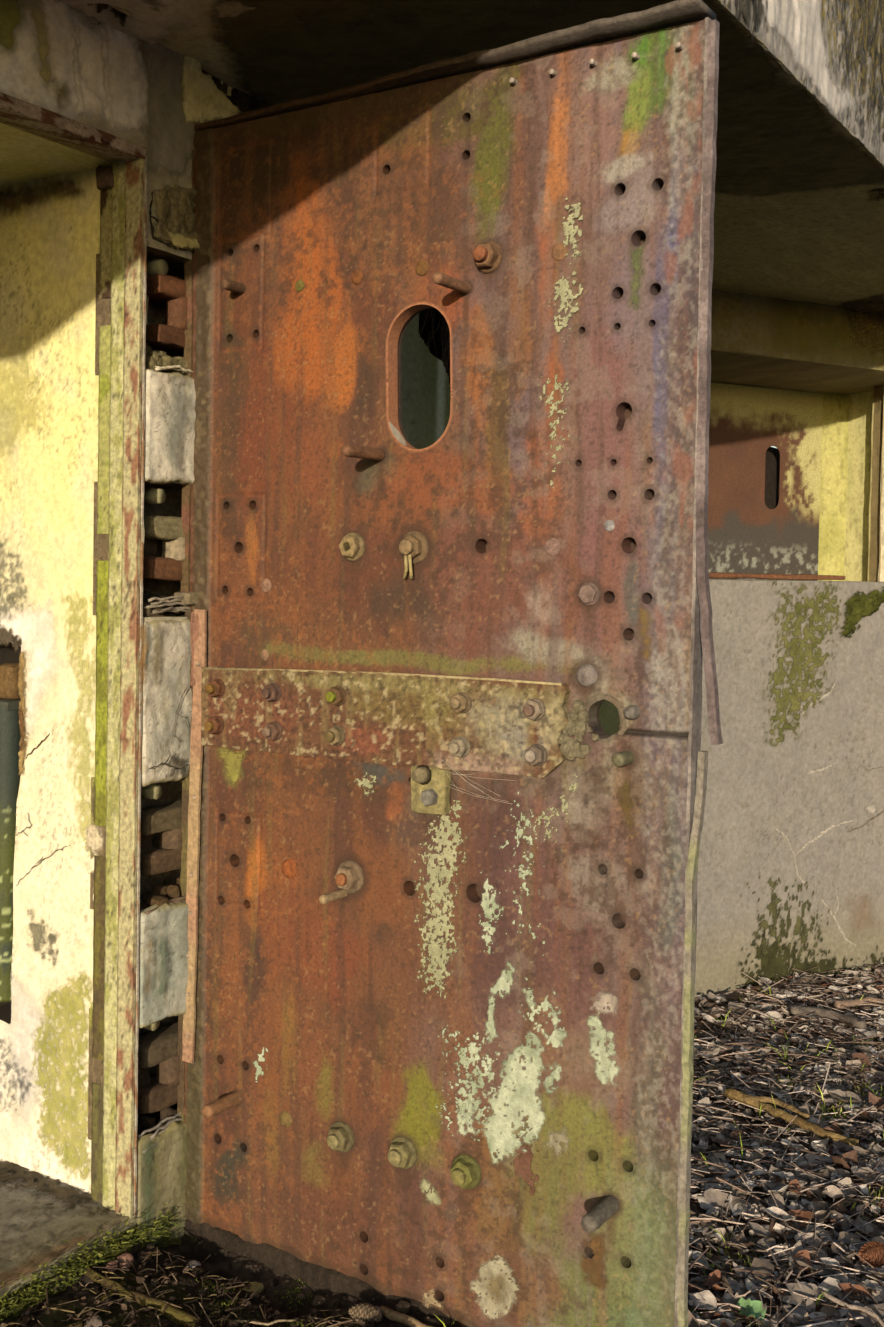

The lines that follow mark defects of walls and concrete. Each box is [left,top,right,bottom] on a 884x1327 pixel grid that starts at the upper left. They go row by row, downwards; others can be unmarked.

water stain [214,0,676,105]
water stain [702,0,884,197]
water stain [0,180,83,212]
water stain [838,295,884,352]
water stain [0,544,55,731]
spalling [0,627,27,775]
rust [218,747,244,783]
water stain [29,916,58,966]
water stain [739,876,884,989]
water stain [0,981,53,1113]
rust [581,1235,607,1288]